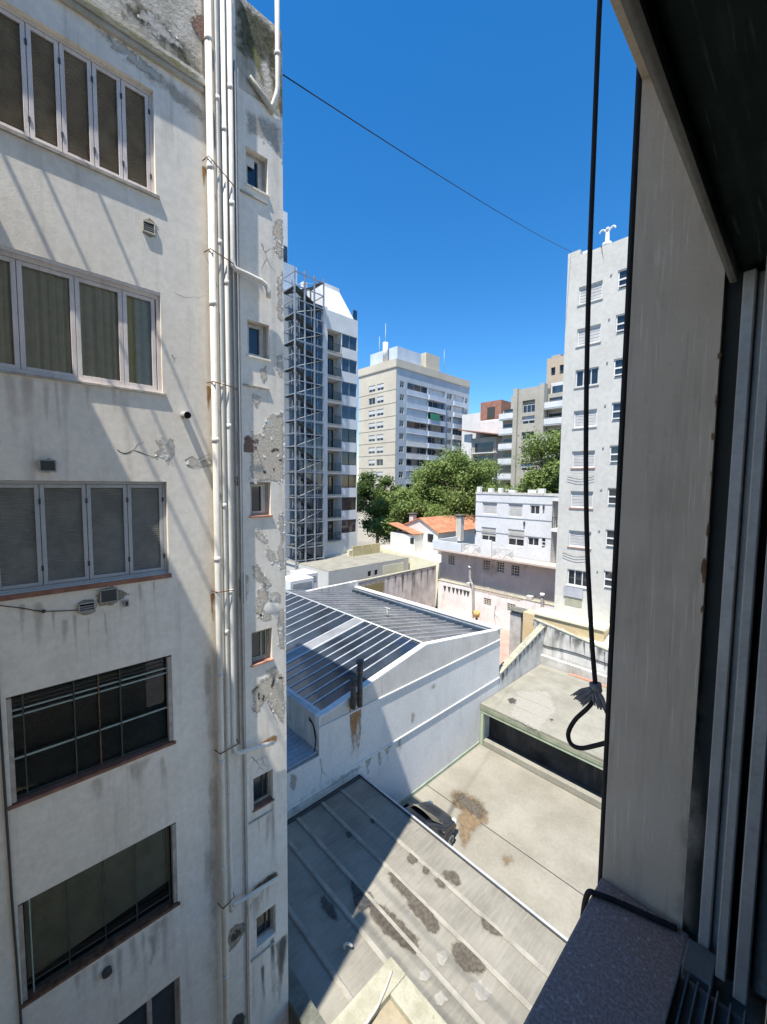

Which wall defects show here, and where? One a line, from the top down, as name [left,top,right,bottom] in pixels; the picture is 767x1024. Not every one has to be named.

water stain [126,1,200,73]
water stain [148,73,202,119]
peeling [272,219,284,258]
crack [117,440,207,469]
peeling [186,457,213,467]
spalling [234,409,285,486]
peeling [251,512,286,652]
spalling [251,671,285,723]
corrosion [349,705,361,741]
water stain [351,880,420,953]
water stain [388,872,439,933]
water stain [437,942,492,1001]